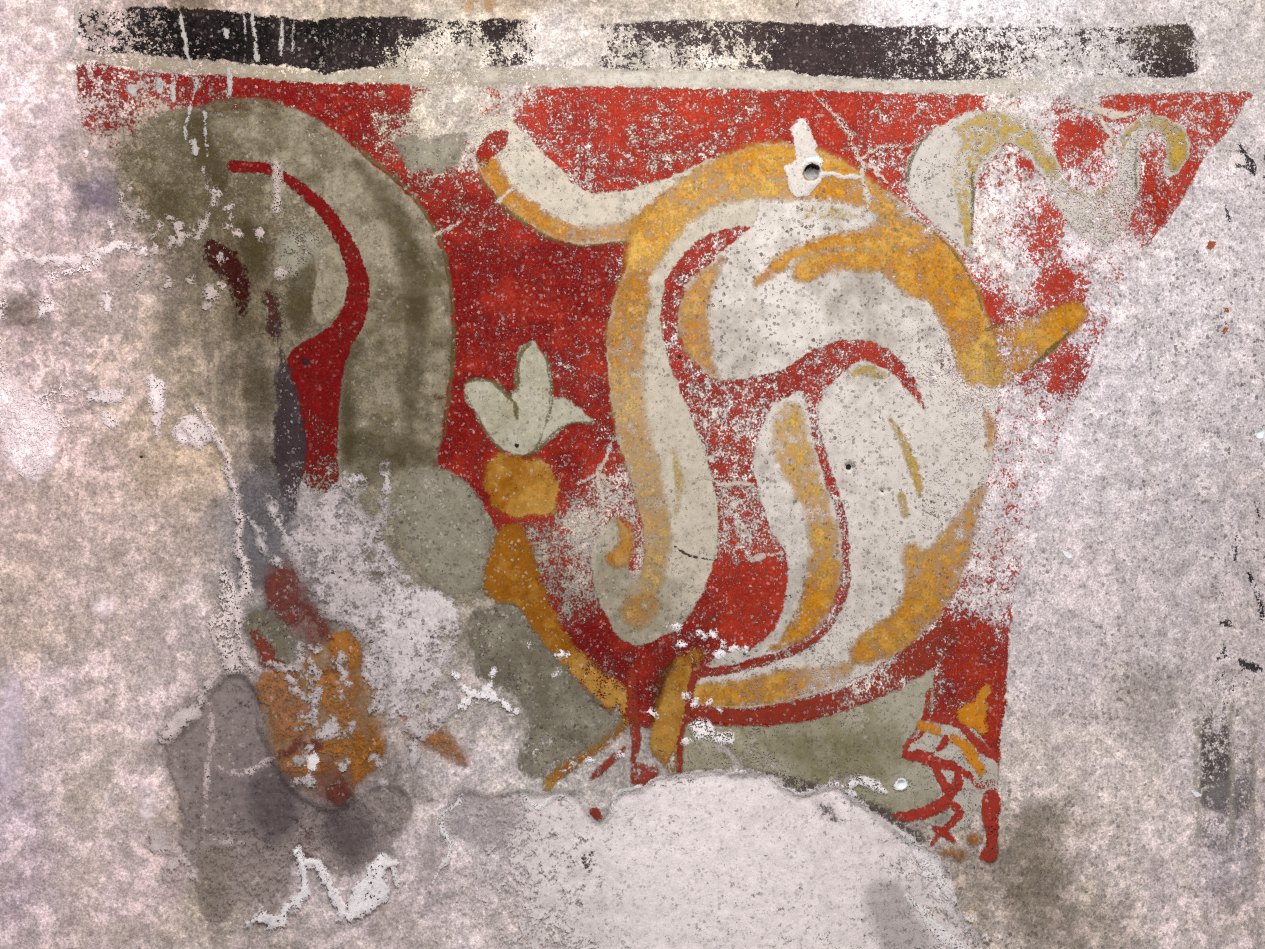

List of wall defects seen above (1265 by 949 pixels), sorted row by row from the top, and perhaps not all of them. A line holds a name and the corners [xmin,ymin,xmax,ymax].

spalling [429,769,984,949]